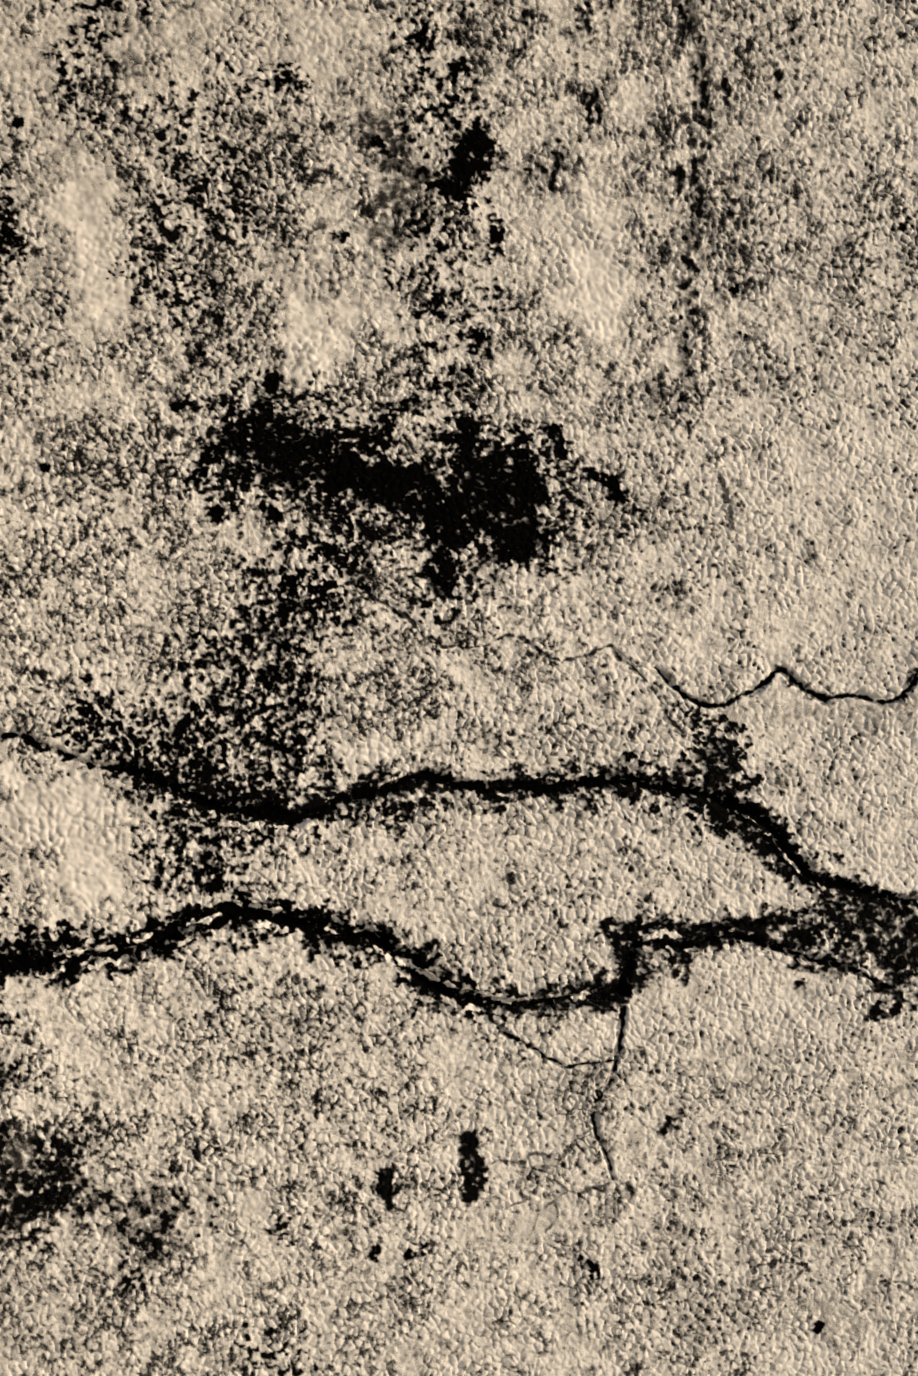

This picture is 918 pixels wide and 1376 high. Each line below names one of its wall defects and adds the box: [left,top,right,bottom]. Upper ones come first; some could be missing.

leakage [40,0,646,921]
crack [0,580,918,1239]